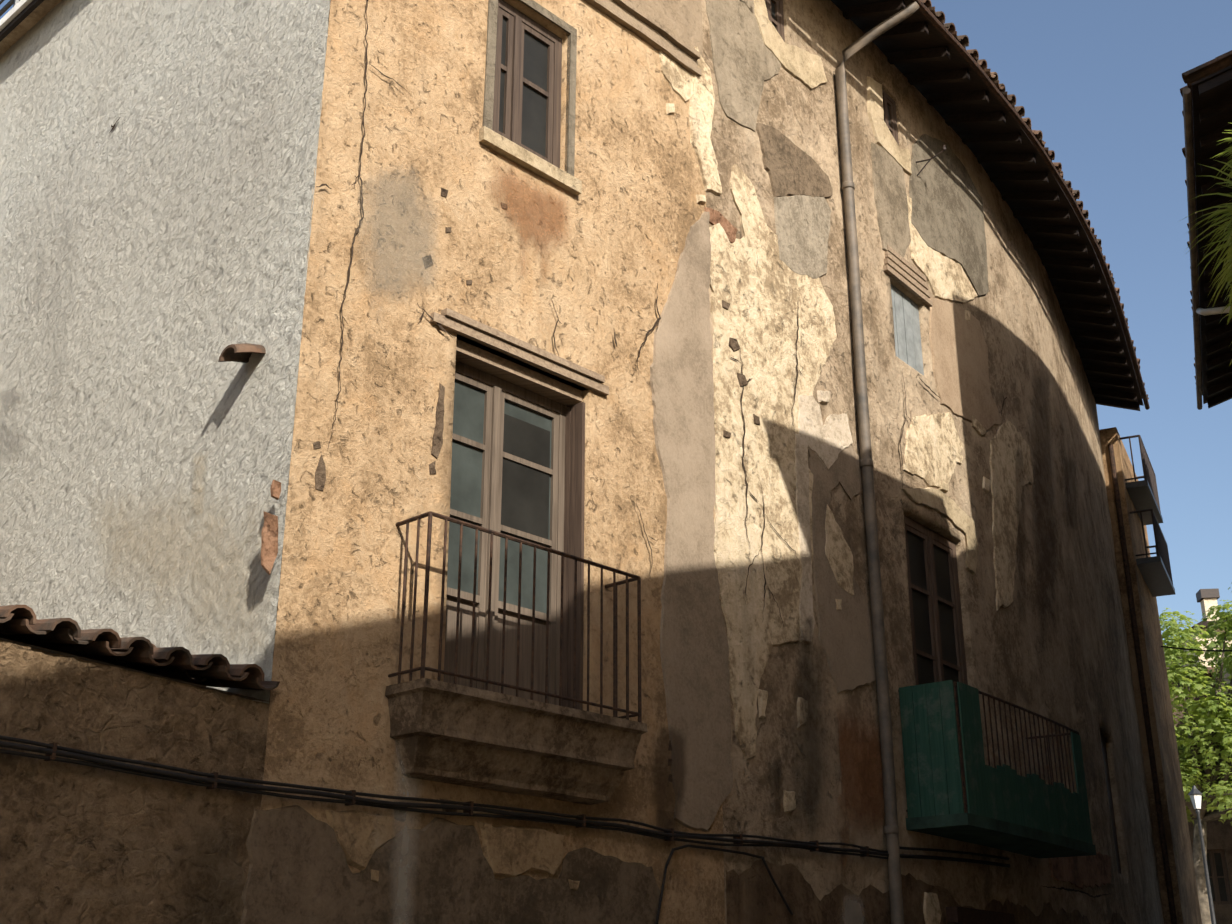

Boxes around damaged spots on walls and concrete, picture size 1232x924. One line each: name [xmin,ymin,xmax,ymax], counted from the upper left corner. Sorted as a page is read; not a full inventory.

crack [316,0,403,448]
flaking render [659,46,854,760]
flaking render [783,790,796,813]
flaking render [325,809,406,882]
flaking render [477,821,580,890]
flaking render [923,892,942,924]